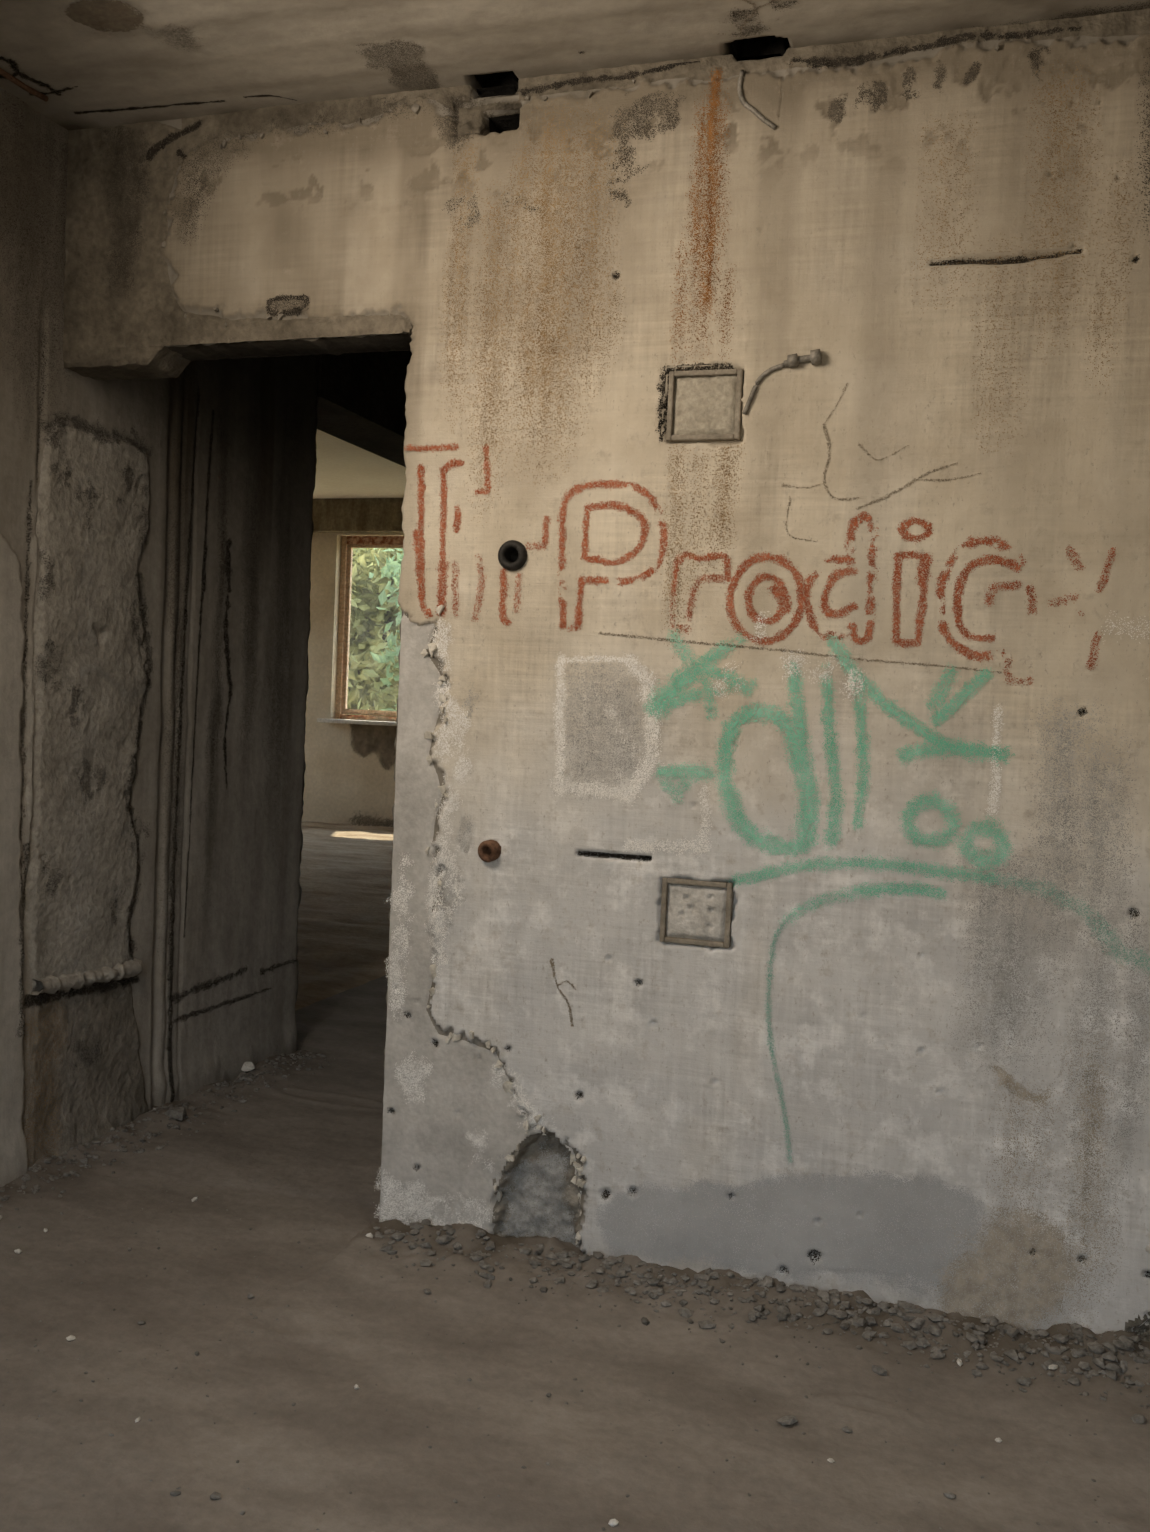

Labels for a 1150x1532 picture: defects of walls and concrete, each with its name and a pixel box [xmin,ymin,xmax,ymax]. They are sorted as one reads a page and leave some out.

flaking render [63,0,1150,351]
rust [670,68,736,371]
flaking render [22,407,154,1165]
flaking render [350,605,587,1247]
flaking render [1125,1312,1150,1342]